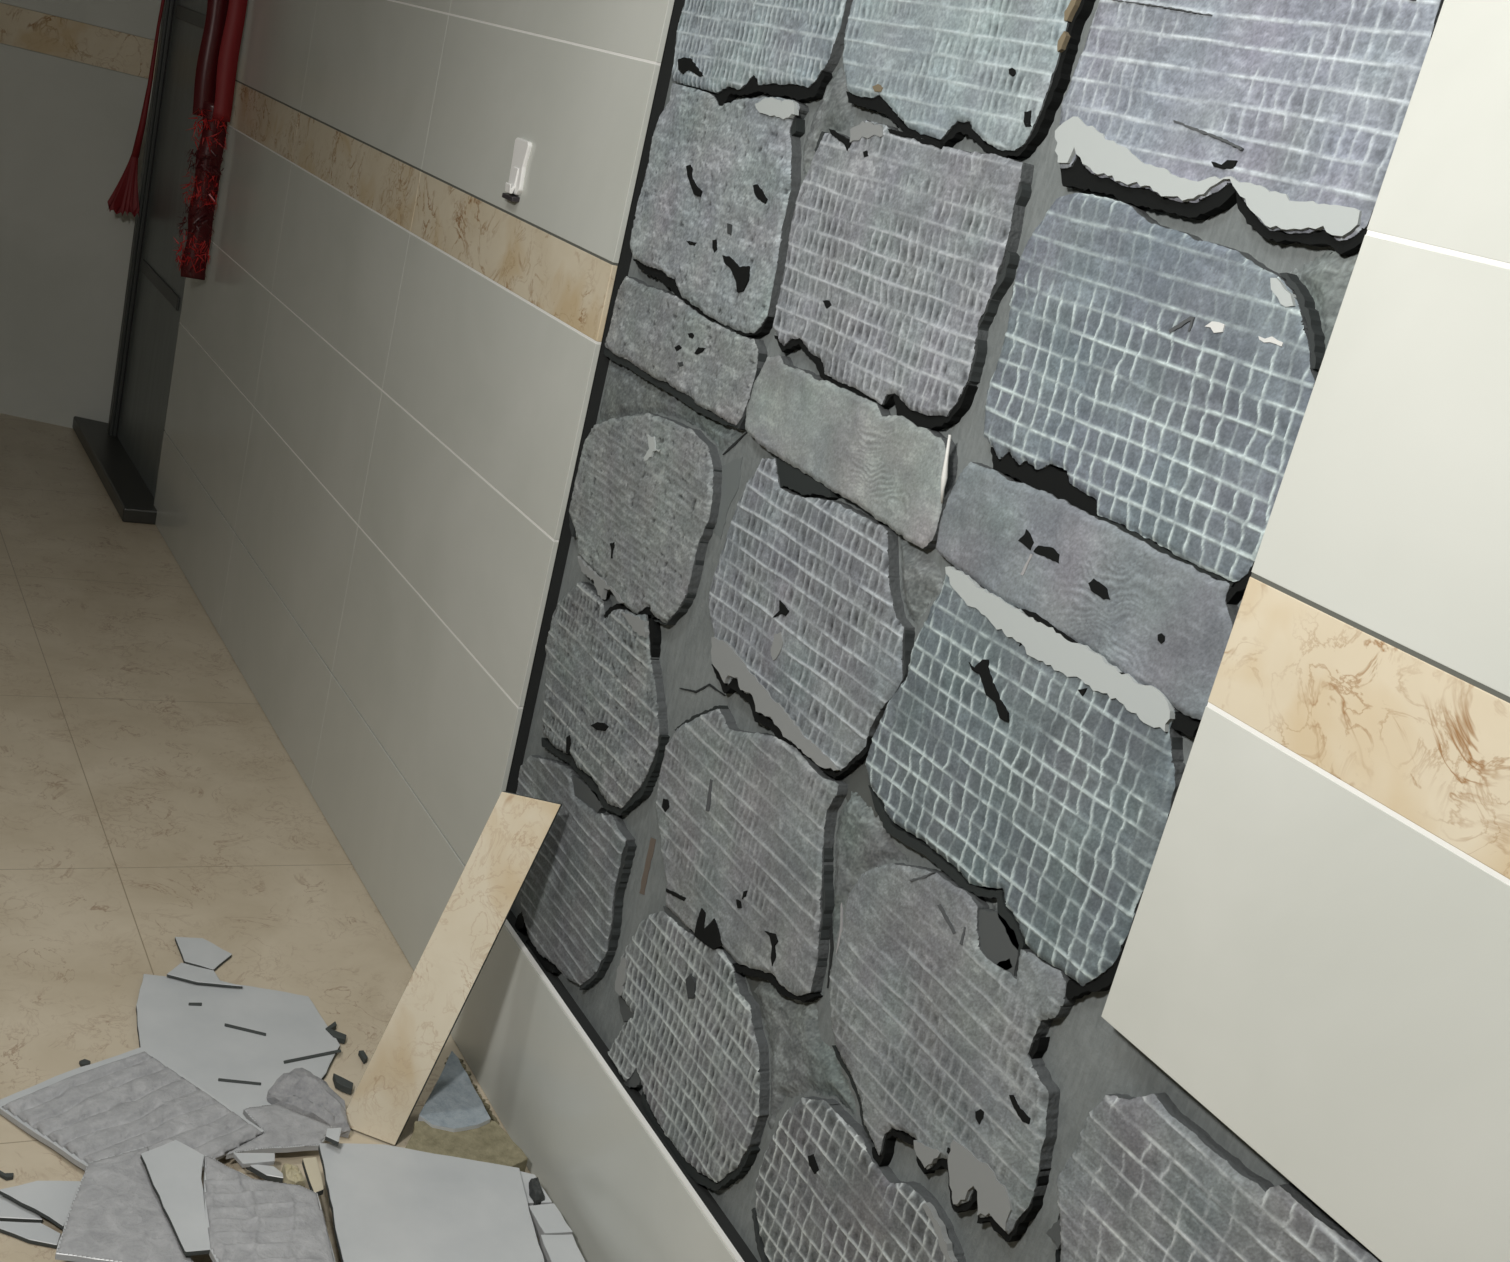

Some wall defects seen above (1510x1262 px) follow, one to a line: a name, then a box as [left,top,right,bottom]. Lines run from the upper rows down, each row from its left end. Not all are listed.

spalling [678,57,703,77]
spalling [791,118,805,138]
spalling [1023,110,1032,127]
hole [722,255,750,293]
spalling [969,659,1010,722]
spalling [573,776,607,813]
spalling [663,906,723,949]
spalling [978,909,1020,976]
spalling [685,974,696,999]
spalling [1046,1219,1061,1249]